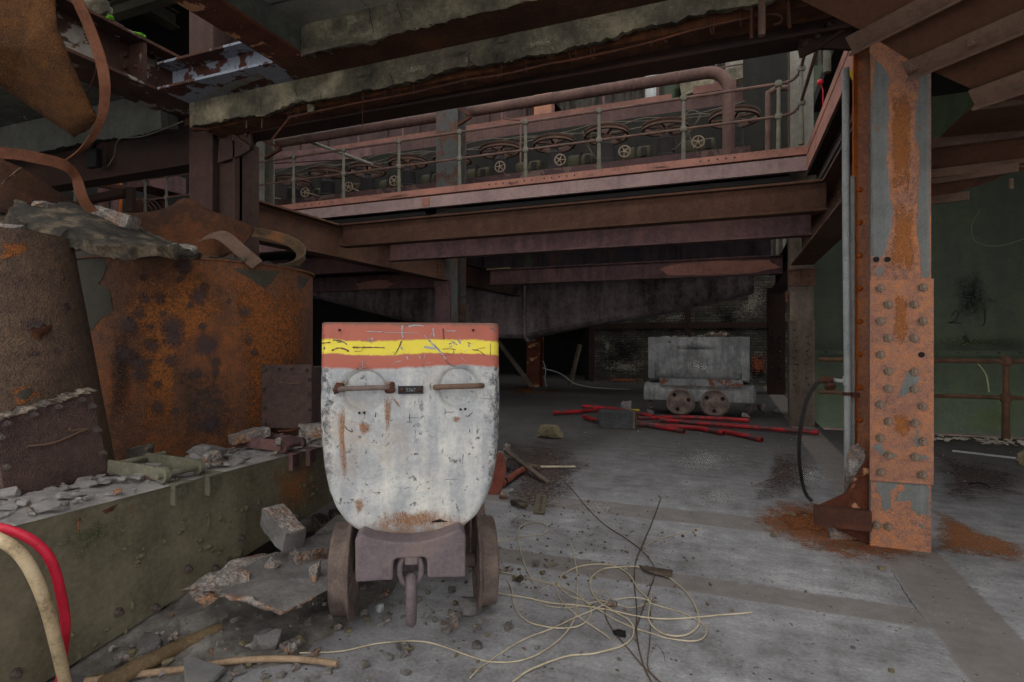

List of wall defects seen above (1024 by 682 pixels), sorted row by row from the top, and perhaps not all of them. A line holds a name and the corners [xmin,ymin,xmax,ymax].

rust [891,96,911,188]
rust [755,454,917,559]
peeling [876,481,930,530]
rust [938,516,1024,561]